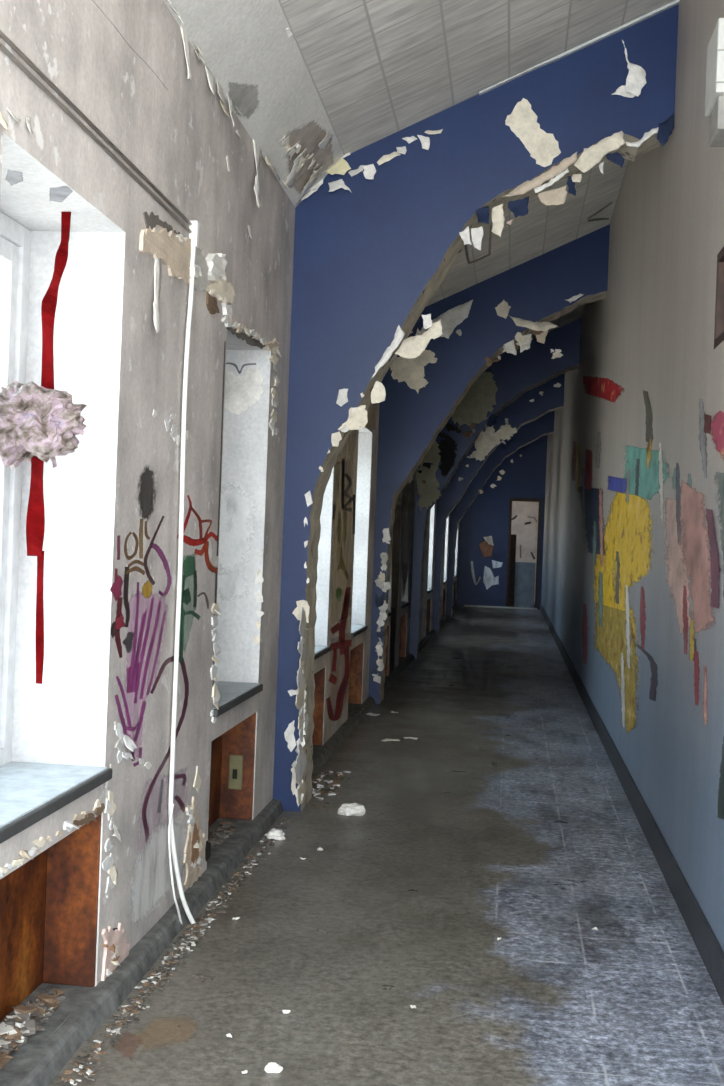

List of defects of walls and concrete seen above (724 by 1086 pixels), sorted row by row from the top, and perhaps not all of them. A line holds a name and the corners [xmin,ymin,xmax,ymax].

peeling [611,40,647,98]
peeling [459,98,675,251]
peeling [152,410,189,446]
flaking render [139,211,282,436]
peeling [327,300,473,454]
flaking render [416,300,563,510]
peeling [304,491,313,527]
peeling [210,603,224,723]
peeling [253,570,264,644]
flaking render [284,600,310,807]
flaking render [131,766,211,921]
flaking render [101,923,130,981]